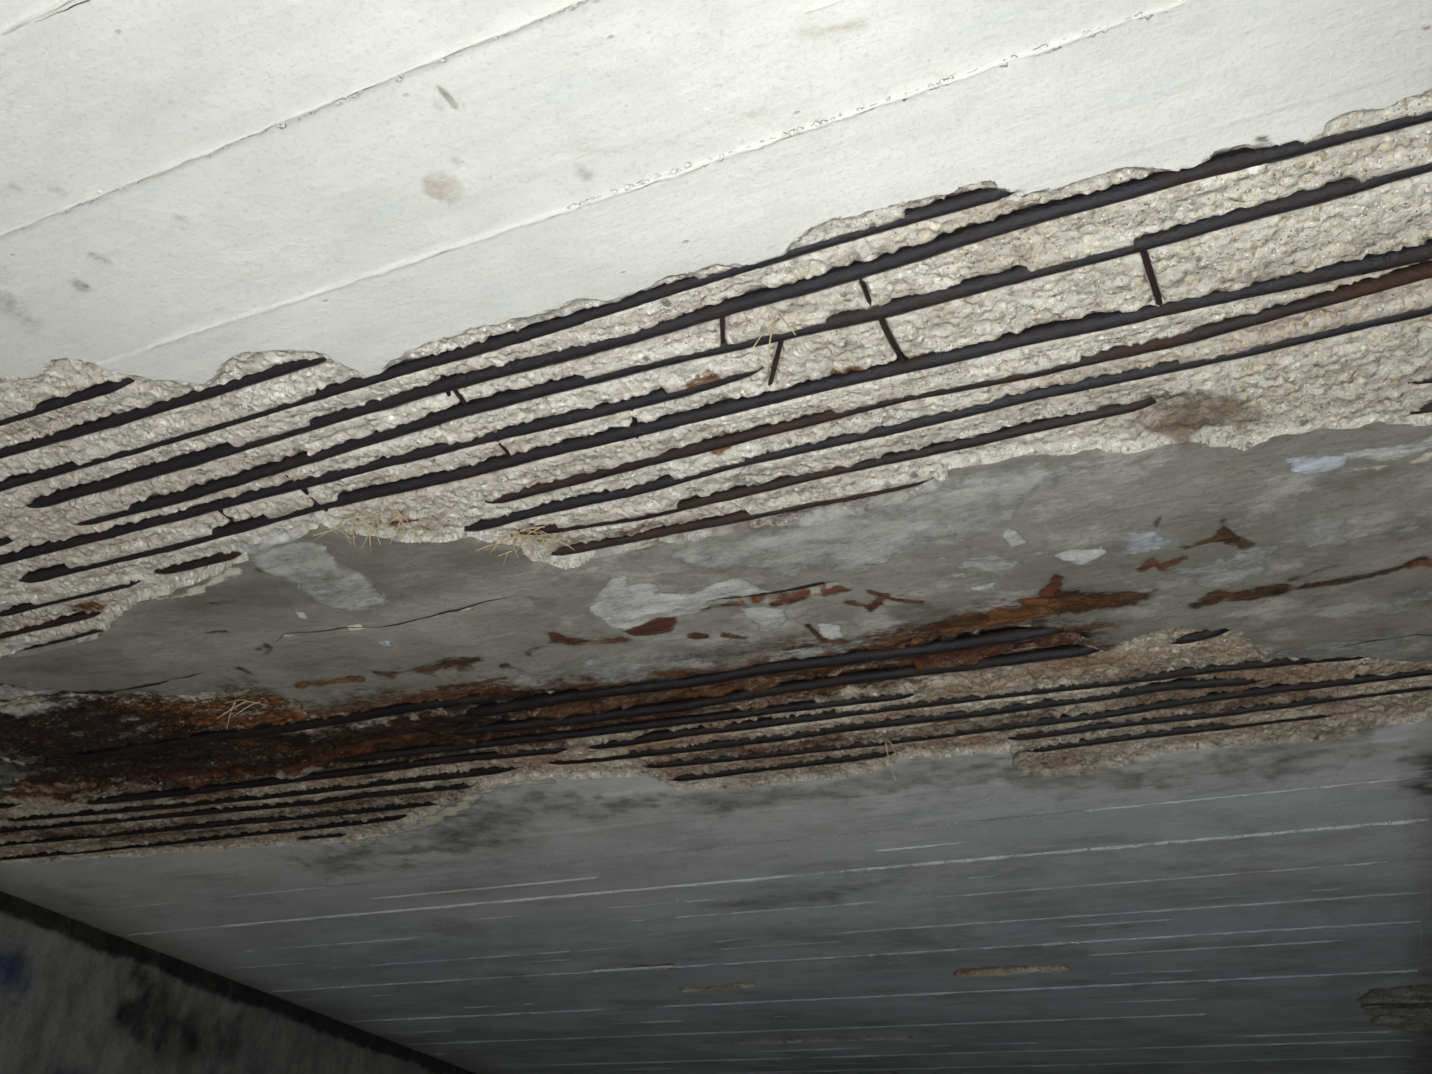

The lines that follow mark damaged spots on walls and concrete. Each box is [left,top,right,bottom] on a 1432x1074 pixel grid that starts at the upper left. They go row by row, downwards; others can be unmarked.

spalling [0,88,1432,658]
corrosion [1137,520,1254,572]
corrosion [1189,556,1432,609]
corrosion [0,574,1150,804]
spalling [0,624,1432,865]
spalling [953,964,1070,978]
spalling [1355,984,1432,1032]